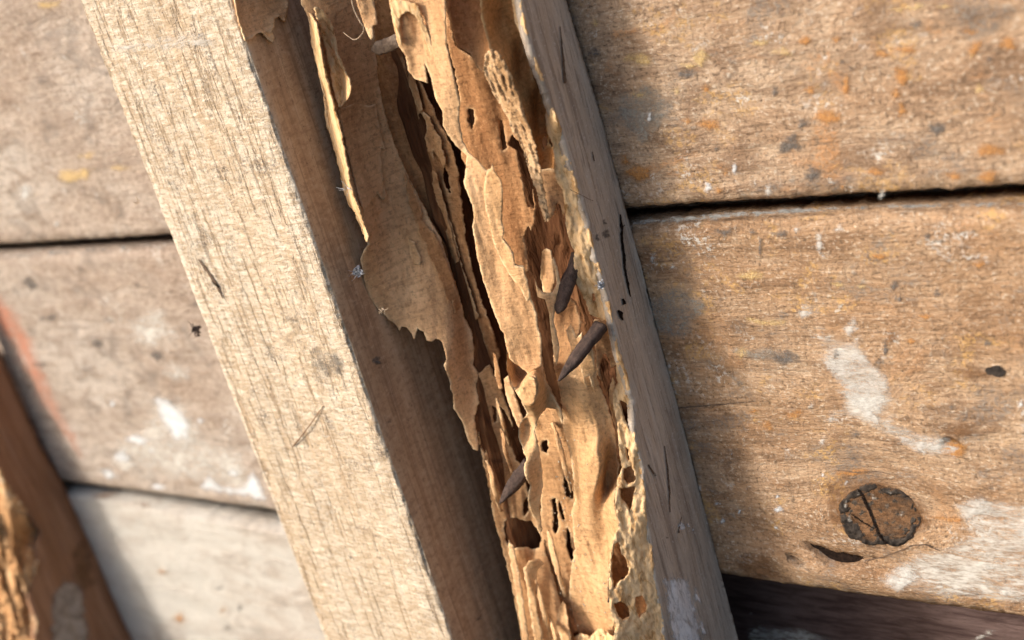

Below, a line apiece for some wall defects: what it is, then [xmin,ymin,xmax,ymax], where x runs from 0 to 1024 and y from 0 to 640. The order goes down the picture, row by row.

peeling [338,102,387,214]
peeling [402,71,479,320]
peeling [484,165,531,301]
peeling [493,352,524,428]
peeling [579,349,596,392]
peeling [609,377,619,441]
crack [811,470,940,563]